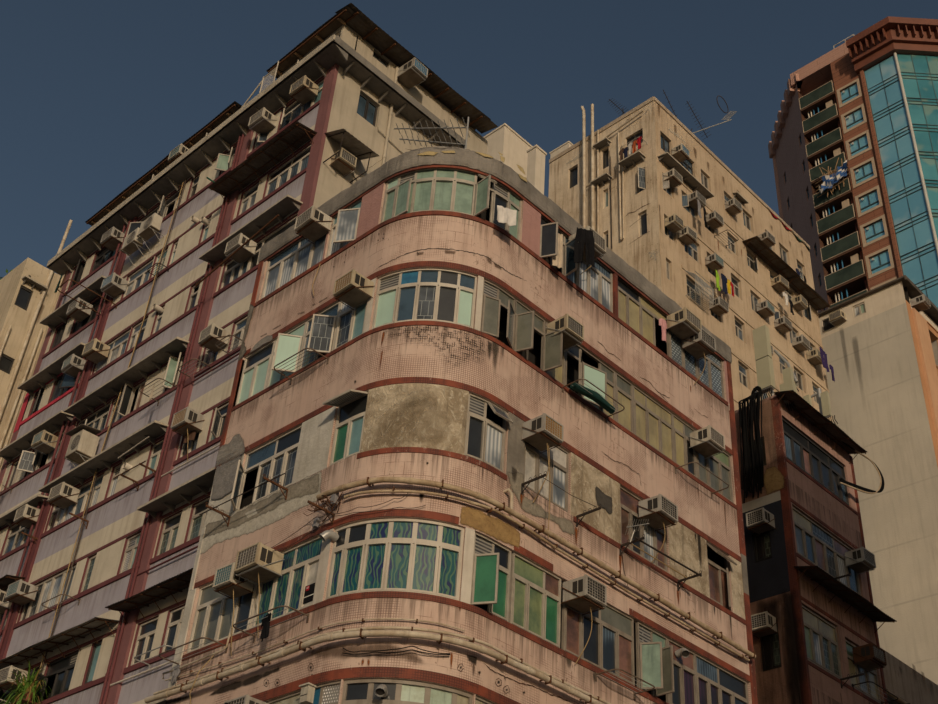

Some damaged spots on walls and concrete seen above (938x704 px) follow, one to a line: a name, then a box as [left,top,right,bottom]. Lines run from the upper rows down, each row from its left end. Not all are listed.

crack [374,248,525,281]
damp [389,325,504,364]
peeling [200,472,322,554]